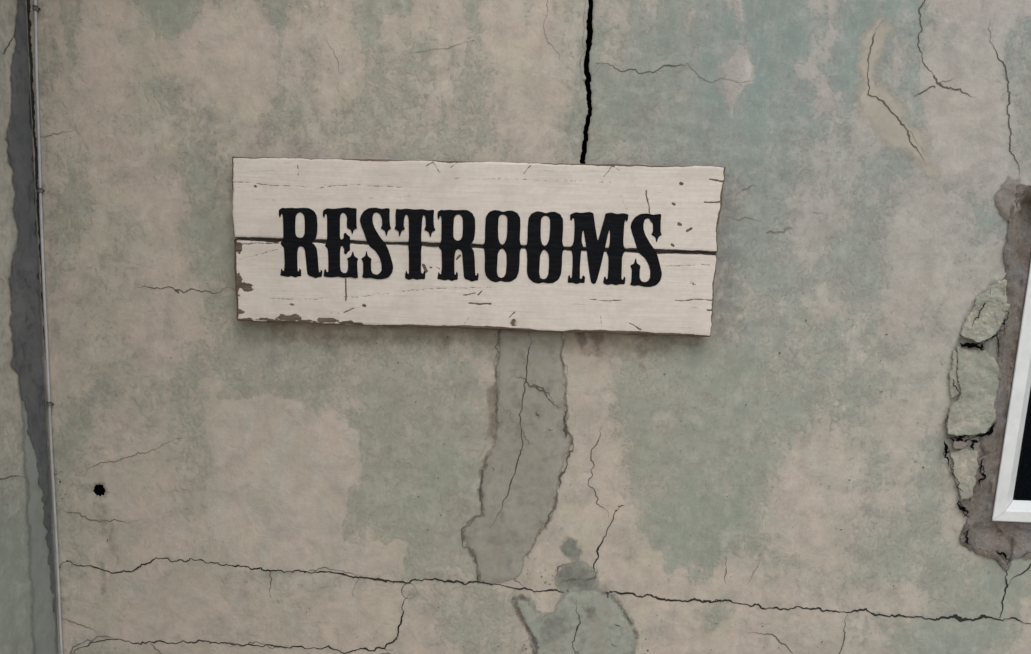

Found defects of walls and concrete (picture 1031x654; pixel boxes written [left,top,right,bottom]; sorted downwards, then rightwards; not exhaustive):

crack [543,0,746,164]
crack [867,23,927,165]
crack [917,0,971,97]
crack [988,19,1020,177]
flaking render [995,177,1031,221]
crack [56,504,132,524]
crack [84,438,181,476]
crack [59,557,581,654]
crack [588,426,1031,654]
flaking render [943,279,1030,565]